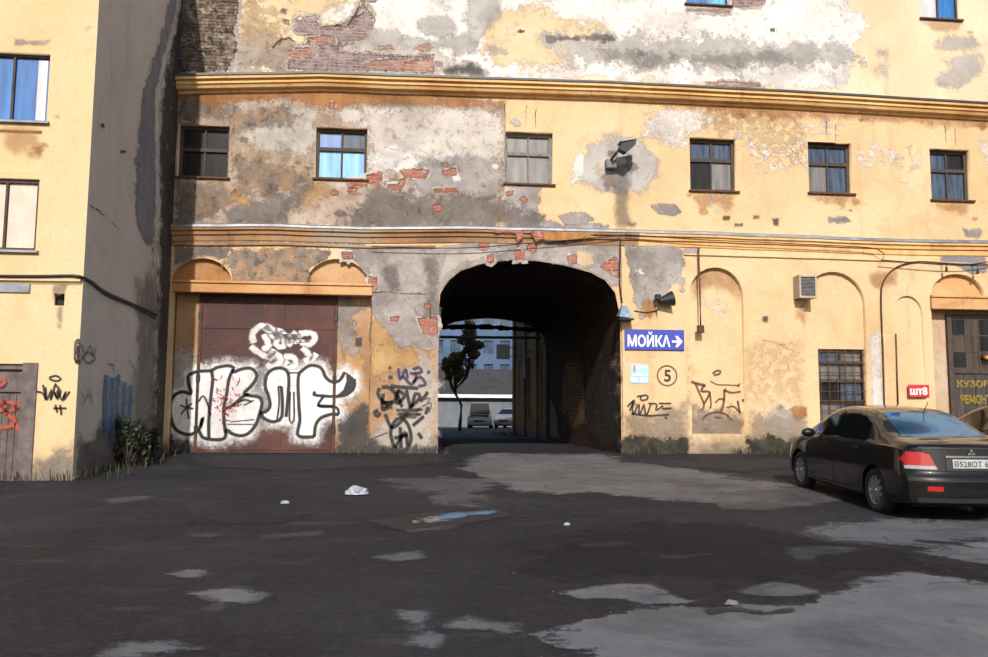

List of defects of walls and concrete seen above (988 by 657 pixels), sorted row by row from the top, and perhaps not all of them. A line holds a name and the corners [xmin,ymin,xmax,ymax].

damp [31,0,365,481]
flaking render [227,92,700,449]
peeling [121,0,870,251]
peeling [857,139,923,185]
flaking render [937,35,983,88]